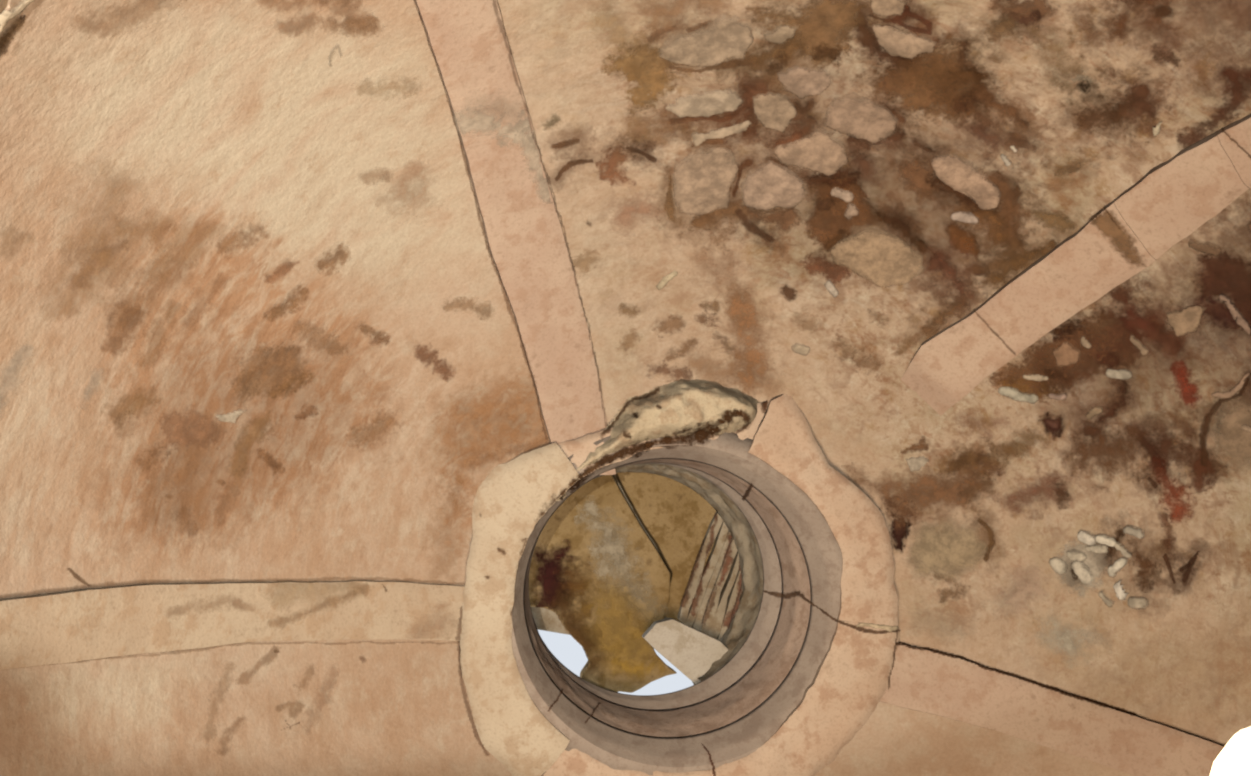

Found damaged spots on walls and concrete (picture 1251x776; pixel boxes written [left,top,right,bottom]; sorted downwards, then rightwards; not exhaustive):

spalling [596,0,1074,335]
spalling [1074,85,1161,136]
spalling [991,242,1251,484]
spalling [902,439,928,472]
spalling [885,498,914,551]
crack [763,590,1137,716]